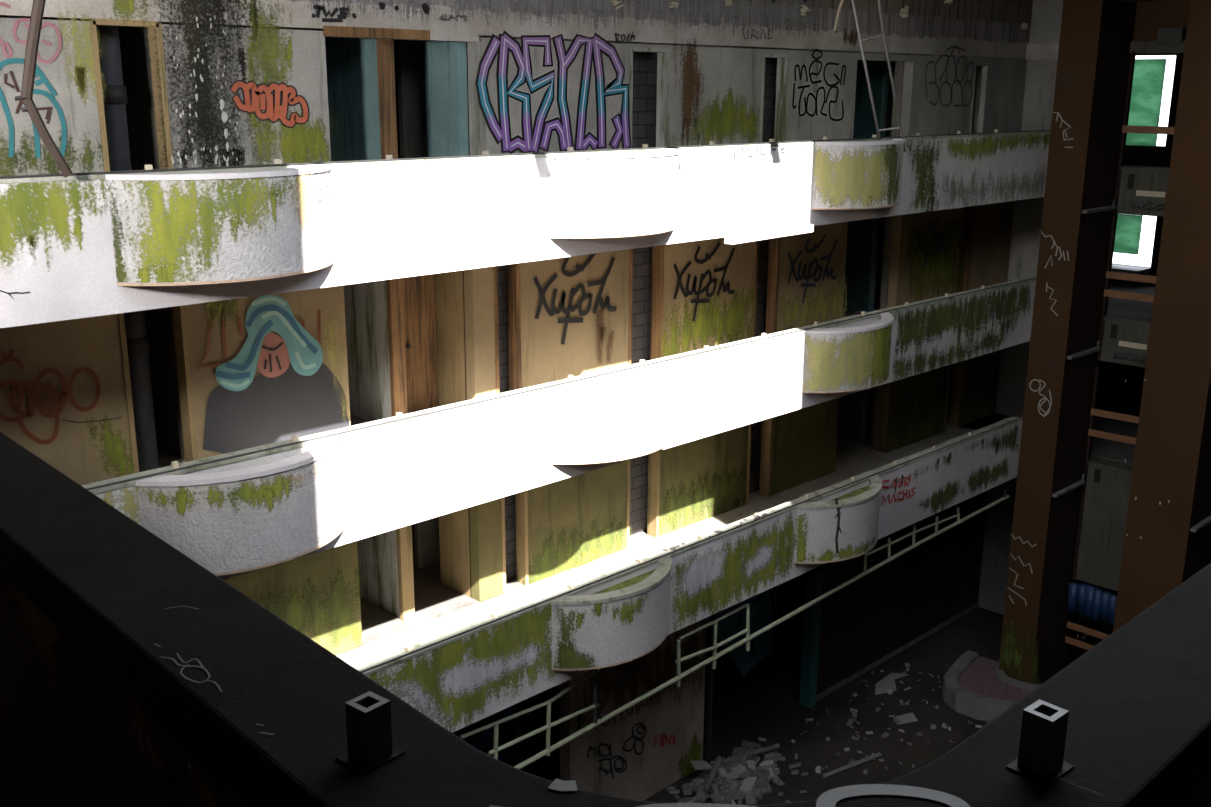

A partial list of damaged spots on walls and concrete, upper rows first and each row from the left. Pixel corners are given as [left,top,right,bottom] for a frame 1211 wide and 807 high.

water stain [143,0,270,169]
water stain [74,217,83,250]
water stain [100,179,175,283]
water stain [299,181,307,223]
water stain [867,144,900,206]
water stain [914,151,1045,211]
crack [834,498,842,554]
water stain [554,603,634,669]
water stain [577,625,708,731]